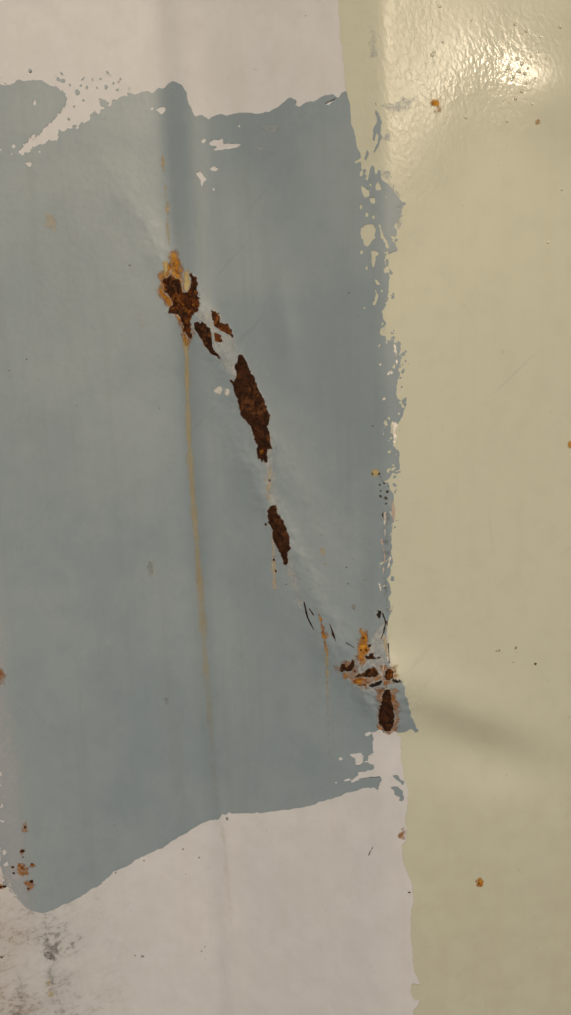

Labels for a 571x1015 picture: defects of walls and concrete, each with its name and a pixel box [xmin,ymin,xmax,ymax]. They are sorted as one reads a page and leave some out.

peeling [0,71,130,167]
peeling [196,166,219,191]
peeling [201,139,240,151]
rust [159,251,201,387]
peeling [355,158,409,528]
rust [303,602,401,734]
peeling [335,730,409,805]